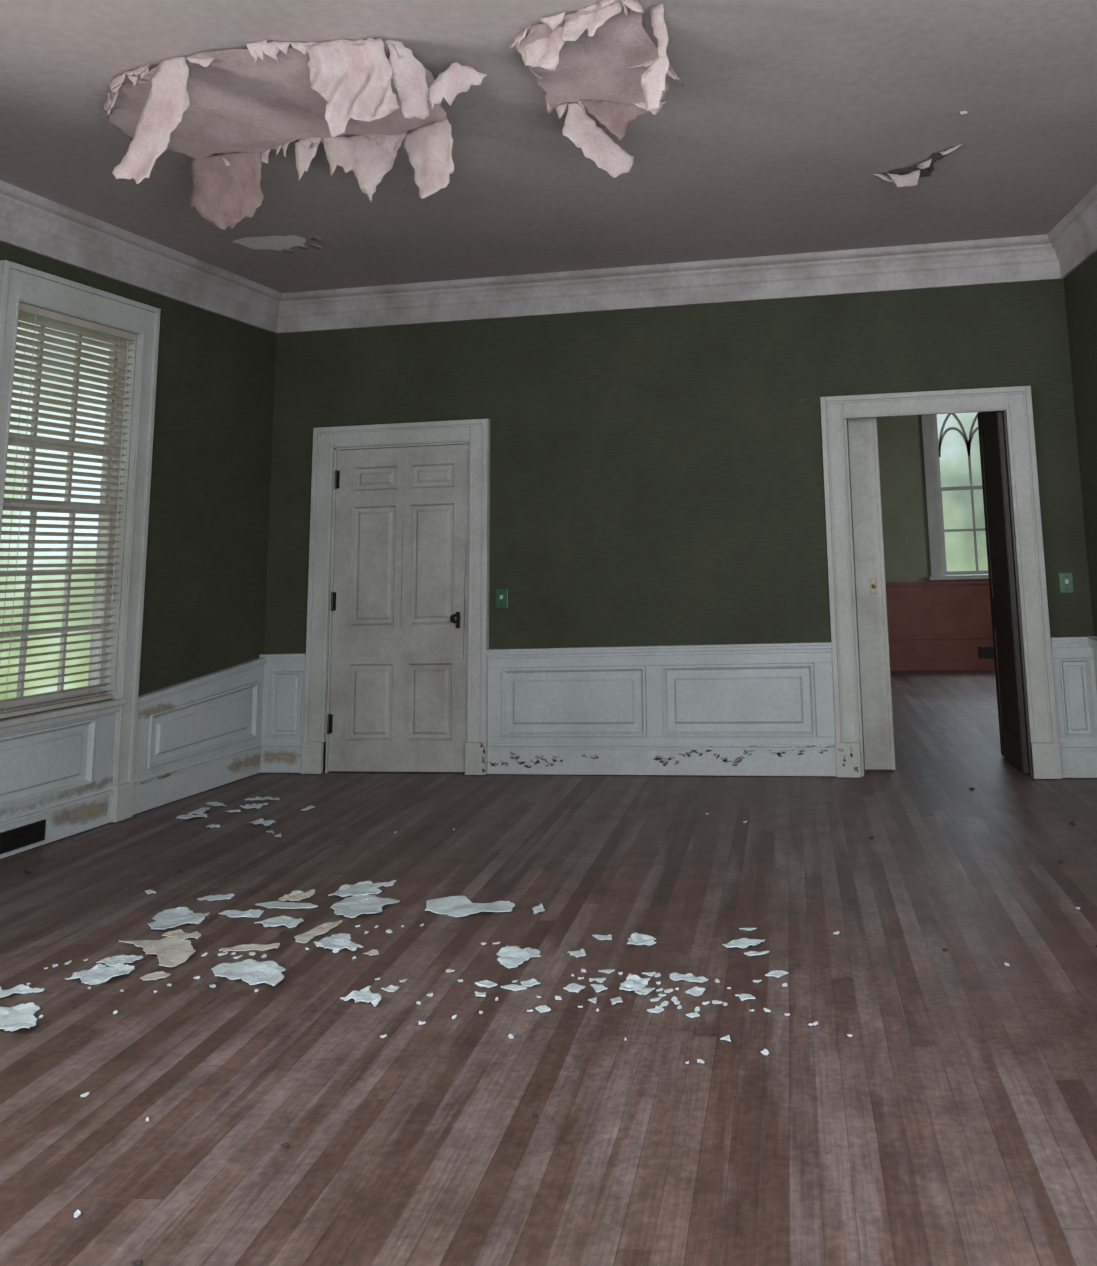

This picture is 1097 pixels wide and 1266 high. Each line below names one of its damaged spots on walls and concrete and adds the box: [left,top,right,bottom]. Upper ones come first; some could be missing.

peeling [103,37,487,253]
peeling [509,0,684,178]
peeling [873,144,964,188]
peeling [653,744,859,772]